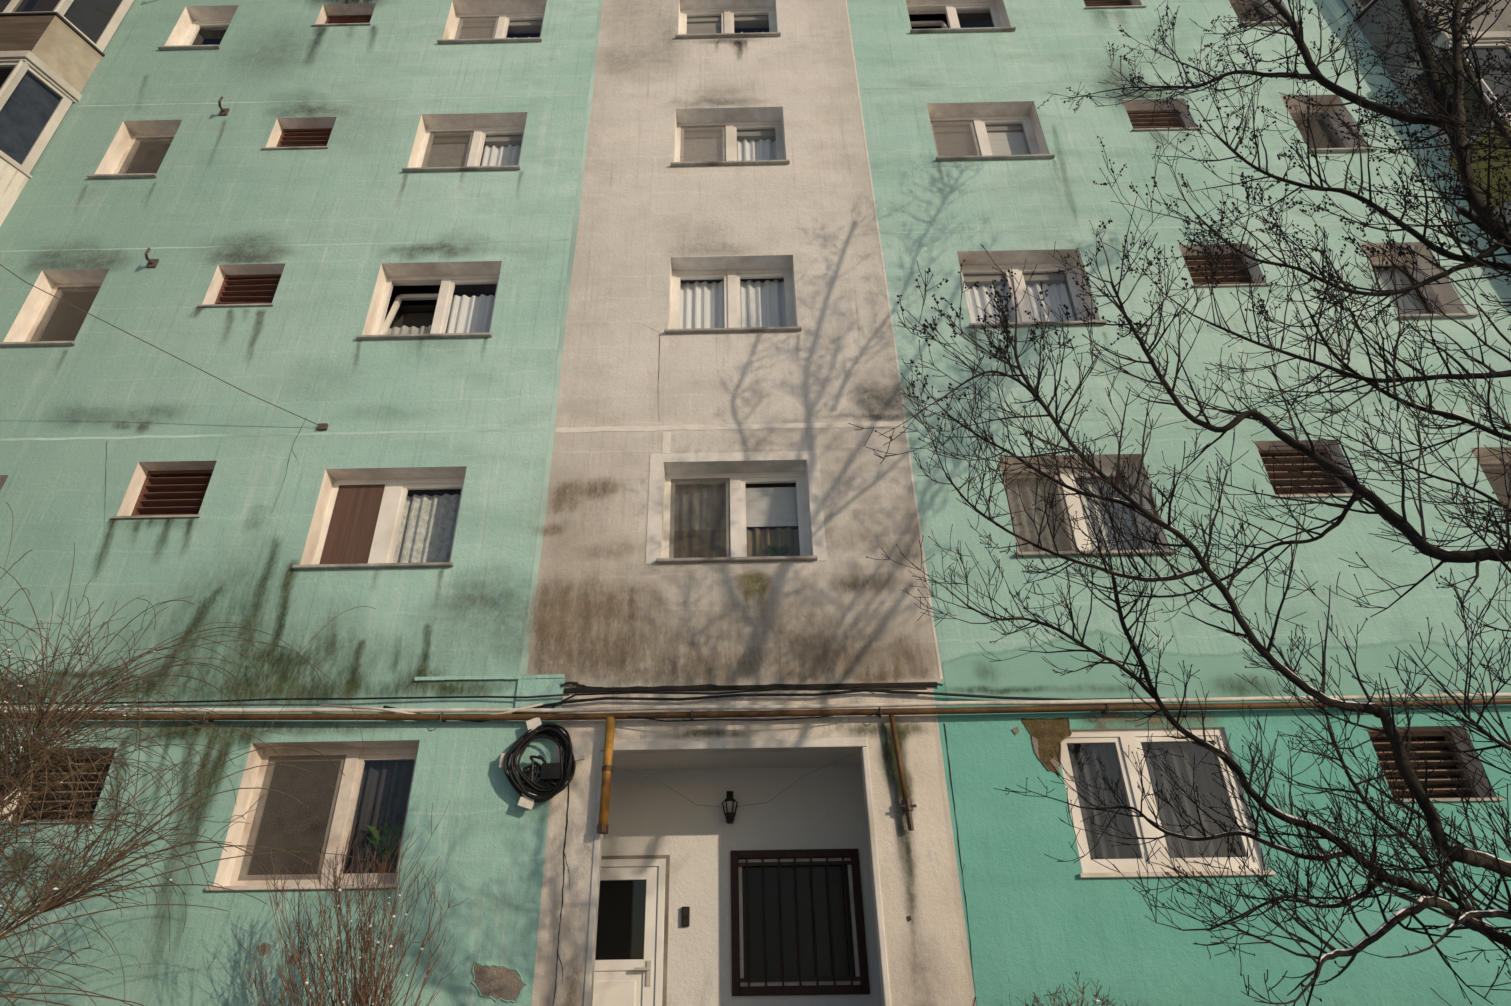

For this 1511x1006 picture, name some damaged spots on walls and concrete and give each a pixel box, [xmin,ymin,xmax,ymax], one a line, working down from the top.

leakage [543,482,617,533]
leakage [245,557,294,651]
leakage [533,584,780,684]
leakage [350,642,362,692]
peeling [1012,718,1072,774]
leakage [182,742,230,833]
flaking render [471,961,528,1003]